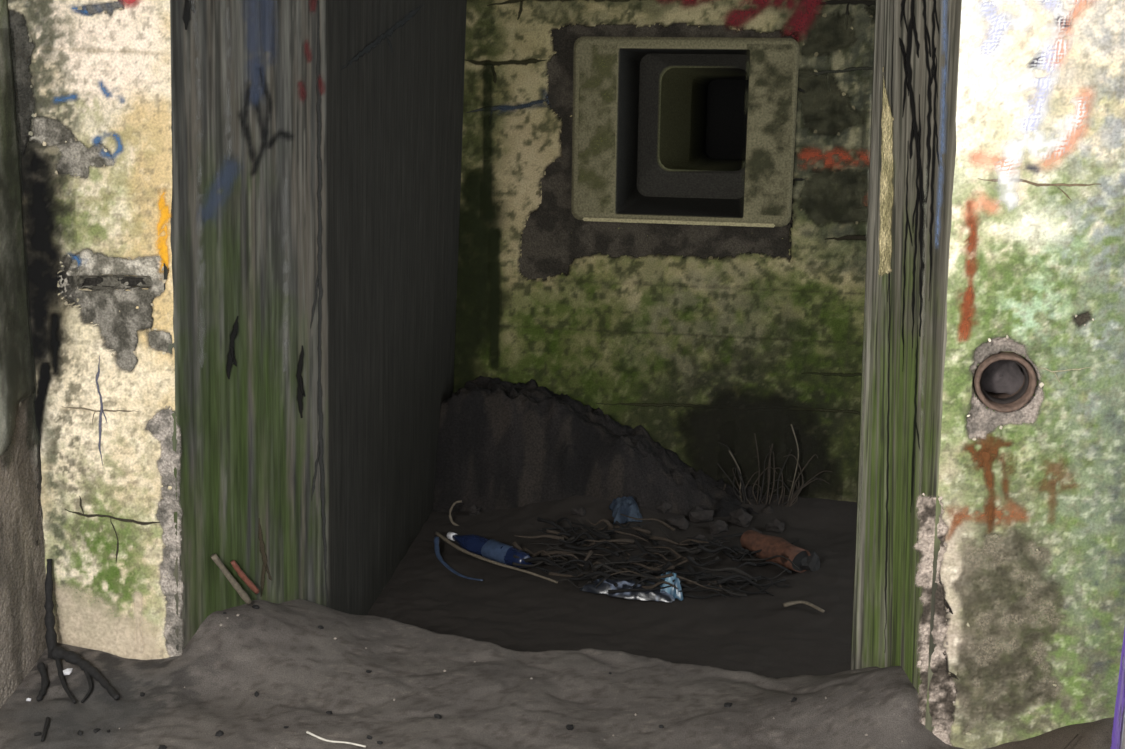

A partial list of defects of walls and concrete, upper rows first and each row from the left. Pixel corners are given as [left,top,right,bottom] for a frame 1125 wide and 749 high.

peeling [8,10,115,179]
spalling [518,12,894,282]
damp [0,114,60,466]
spalling [59,249,172,372]
spalling [145,406,183,657]
crack [790,0,939,649]
corrosion [950,436,1027,534]
peeling [914,493,1065,746]
spalling [966,335,1044,441]